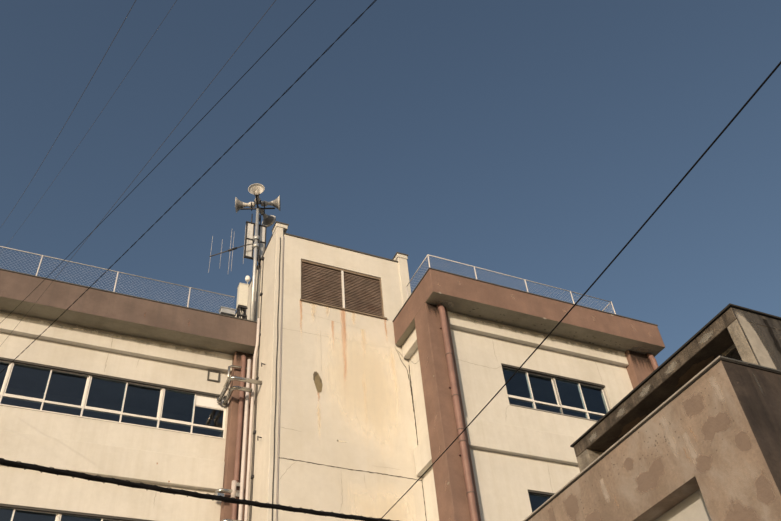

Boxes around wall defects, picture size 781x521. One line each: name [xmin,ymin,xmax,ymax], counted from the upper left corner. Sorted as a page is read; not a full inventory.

water stain [736,314,781,369]